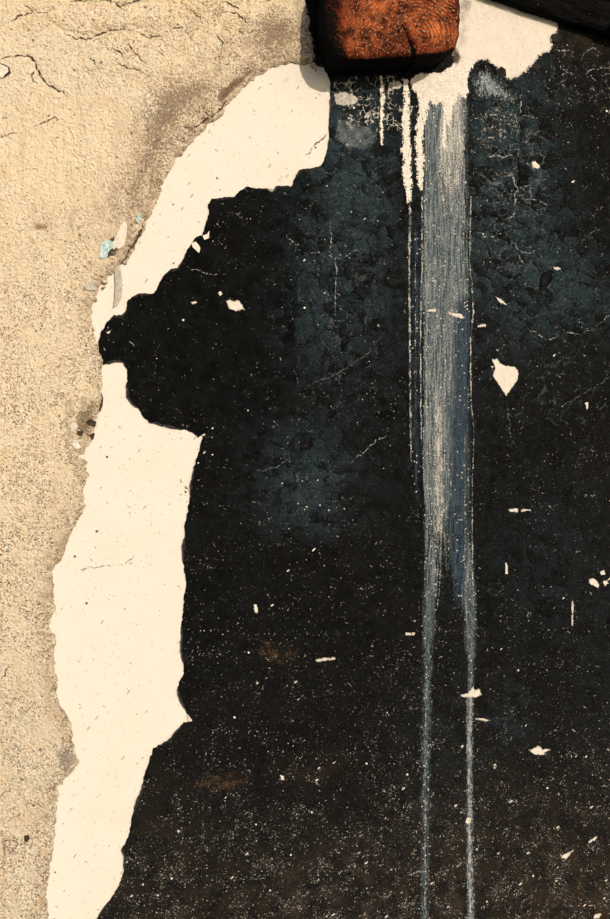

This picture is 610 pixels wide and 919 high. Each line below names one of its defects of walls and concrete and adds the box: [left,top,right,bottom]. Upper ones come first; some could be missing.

crack [11,6,48,21]
crack [65,0,249,73]
crack [2,55,68,97]
crack [0,116,63,138]
crack [179,98,228,142]
peeling [492,358,519,398]
peeling [45,62,358,919]
damp [336,48,512,919]